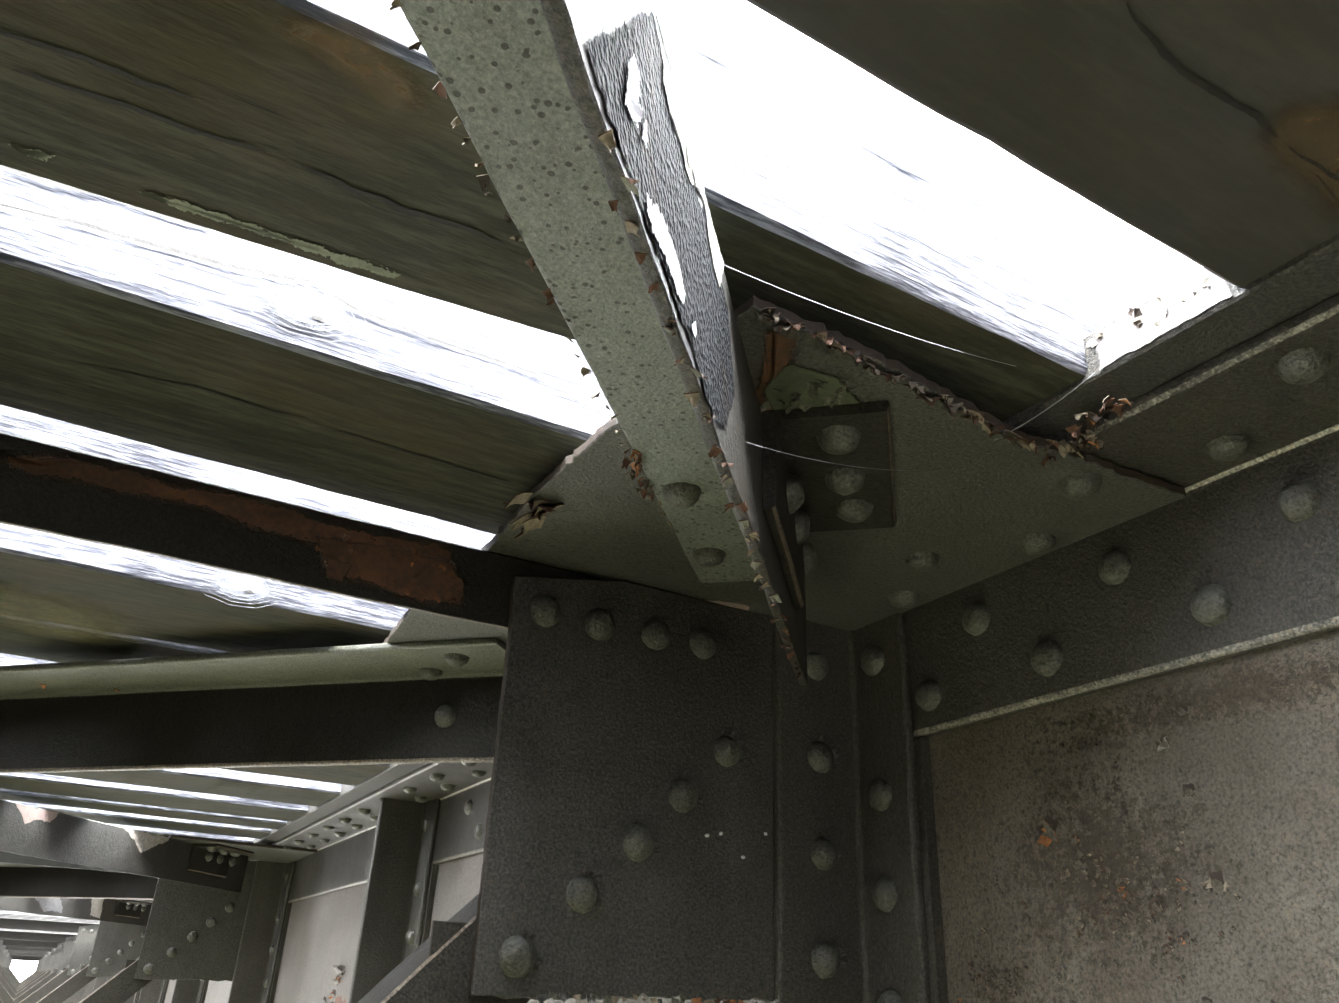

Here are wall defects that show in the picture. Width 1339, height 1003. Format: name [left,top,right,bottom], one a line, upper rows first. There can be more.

peeling [586,9,735,431]
corrosion [755,307,1040,456]
corrosion [5,454,466,606]
corrosion [536,990,758,1003]